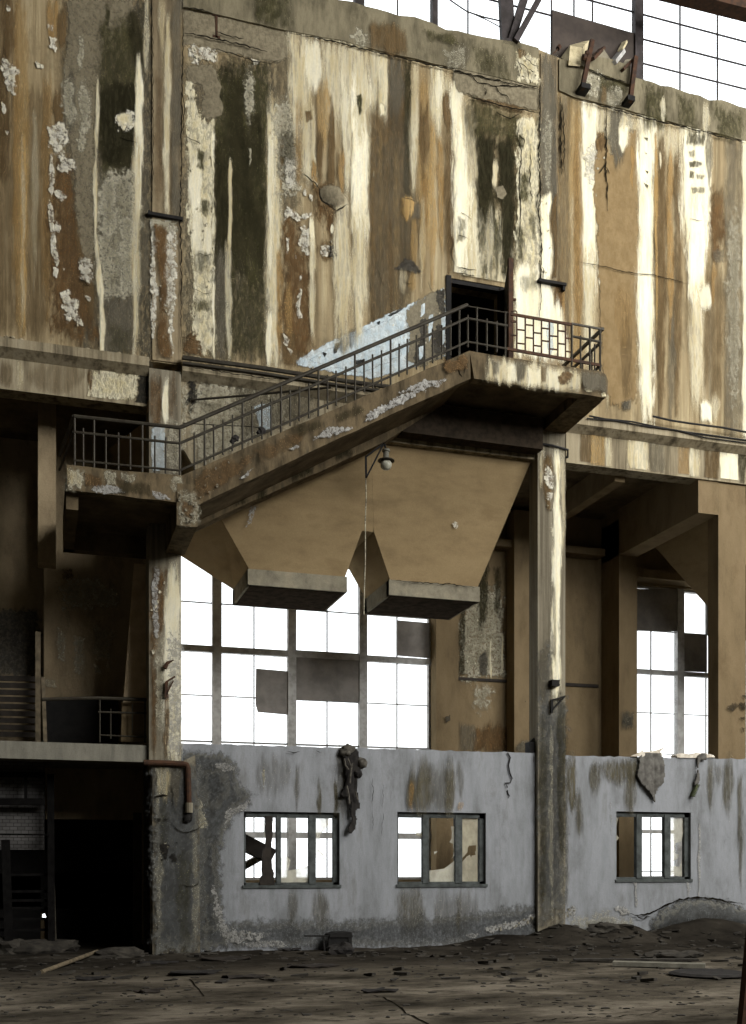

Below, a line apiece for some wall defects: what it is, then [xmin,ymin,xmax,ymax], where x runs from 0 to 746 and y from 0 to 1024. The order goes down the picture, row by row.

peeling [0,58,20,114]
damp [68,469,135,494]
peeling [47,0,218,358]
damp [52,0,522,404]
peeling [283,288,468,379]
damp [314,379,447,440]
crack [291,33,744,317]
rust [550,280,565,331]
rust [699,188,726,398]
rust [149,566,182,759]
damp [147,451,583,955]
peeling [459,565,507,713]